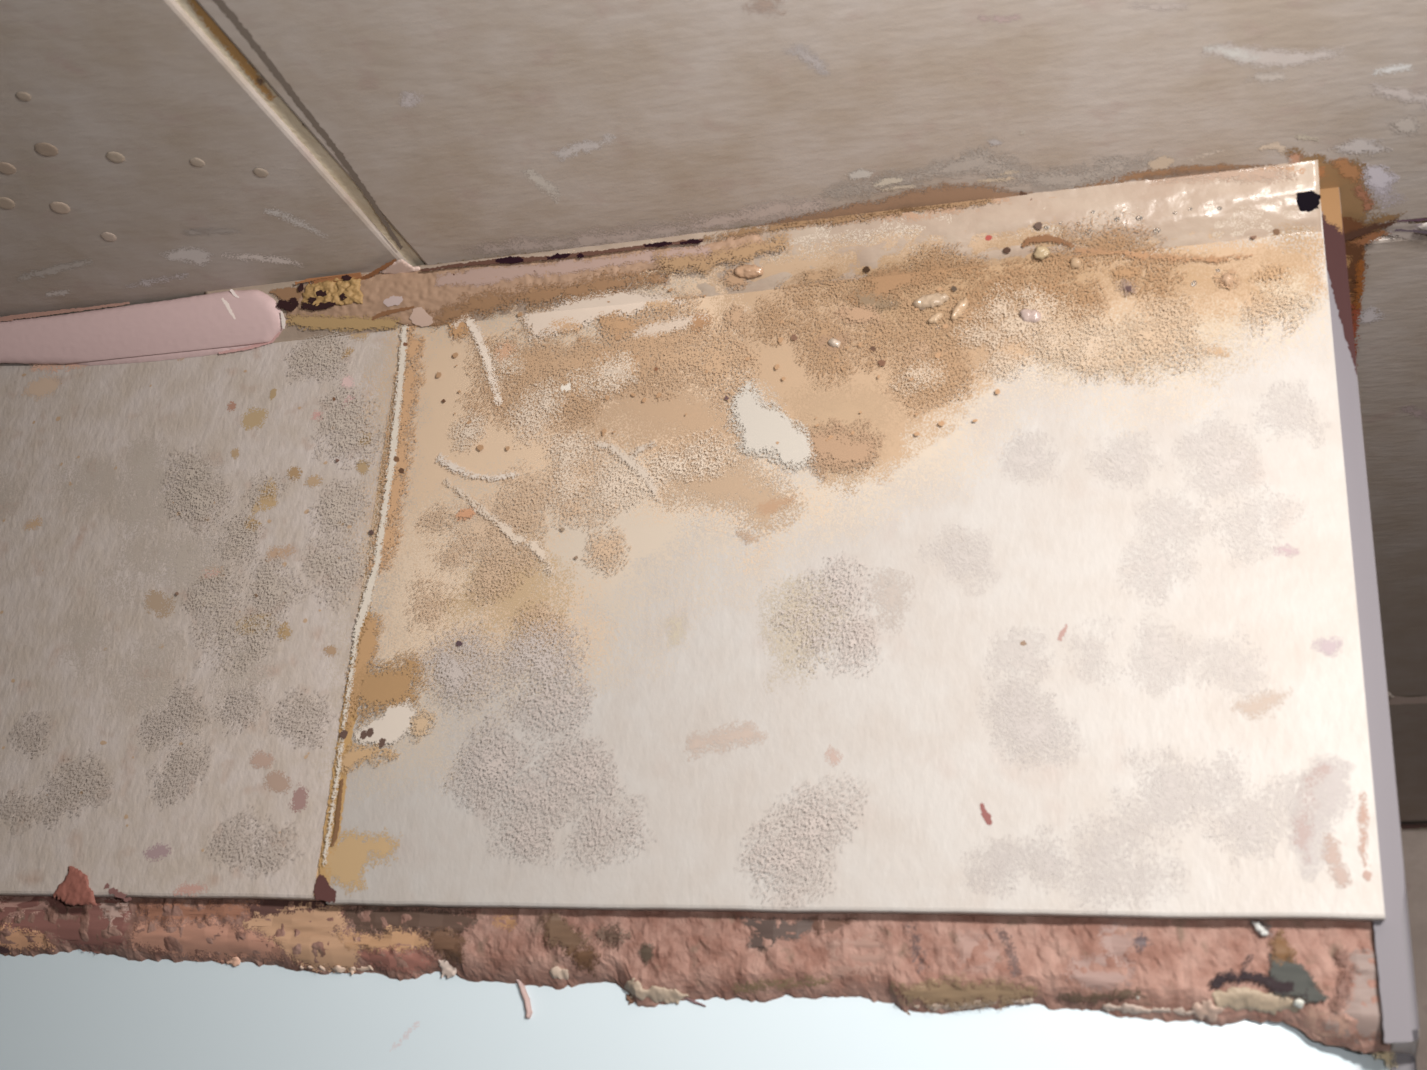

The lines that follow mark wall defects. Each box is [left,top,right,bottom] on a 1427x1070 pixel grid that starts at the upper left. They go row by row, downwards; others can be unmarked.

corrosion [1281,147,1405,366]
damp [51,134,1357,877]
peeling [0,866,1391,1053]